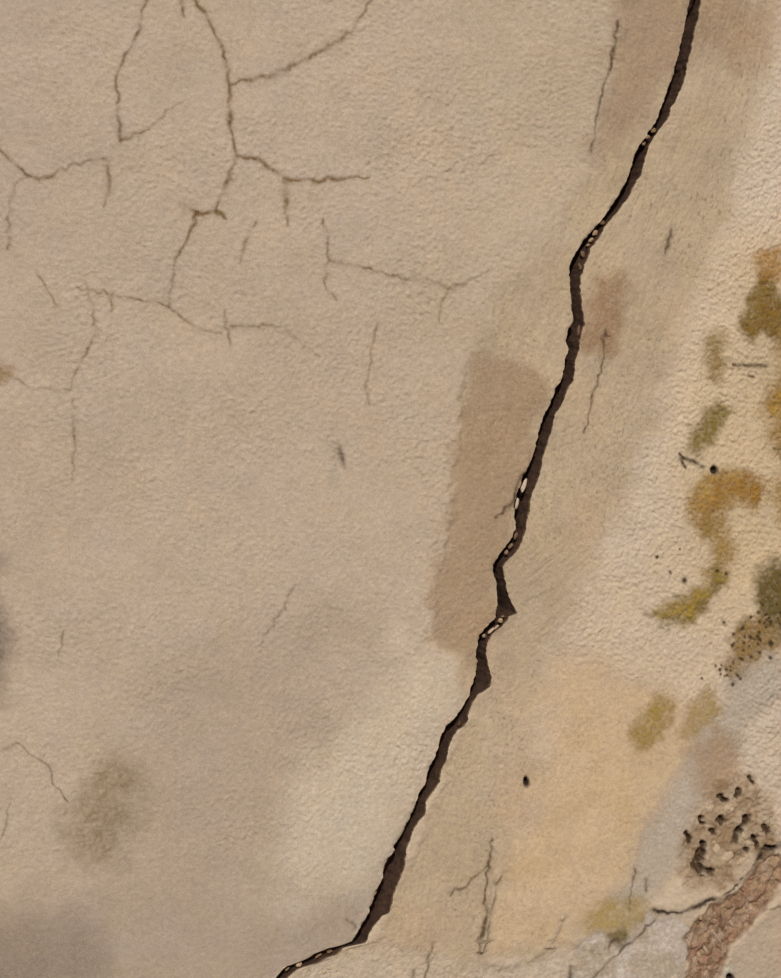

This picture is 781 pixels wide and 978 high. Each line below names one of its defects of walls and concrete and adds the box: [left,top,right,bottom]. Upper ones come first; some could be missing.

crack [182,0,369,204]
crack [179,205,225,254]
leakage [740,249,781,338]
leakage [693,404,729,448]
leakage [766,385,781,446]
crack [276,0,701,978]
leakage [654,470,762,623]
flaking render [683,775,774,887]